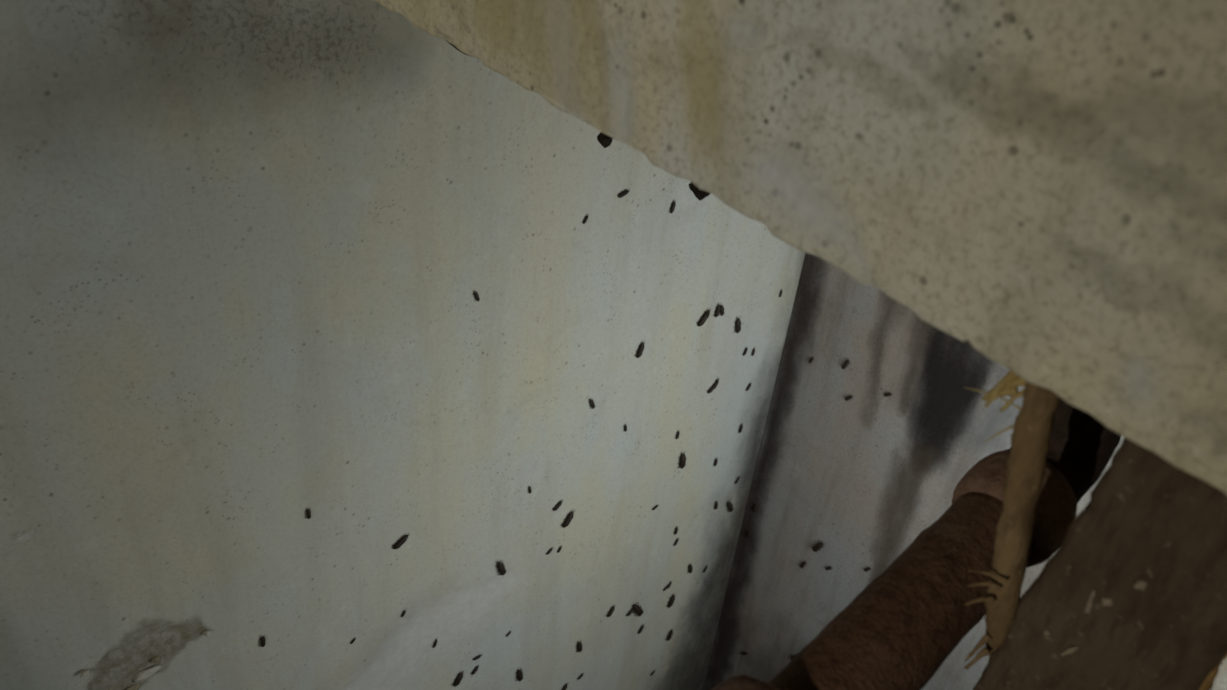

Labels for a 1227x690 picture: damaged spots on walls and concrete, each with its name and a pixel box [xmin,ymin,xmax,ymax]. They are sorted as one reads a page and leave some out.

leakage [676,253,822,690]
leakage [875,324,992,578]
spalling [80,620,211,690]